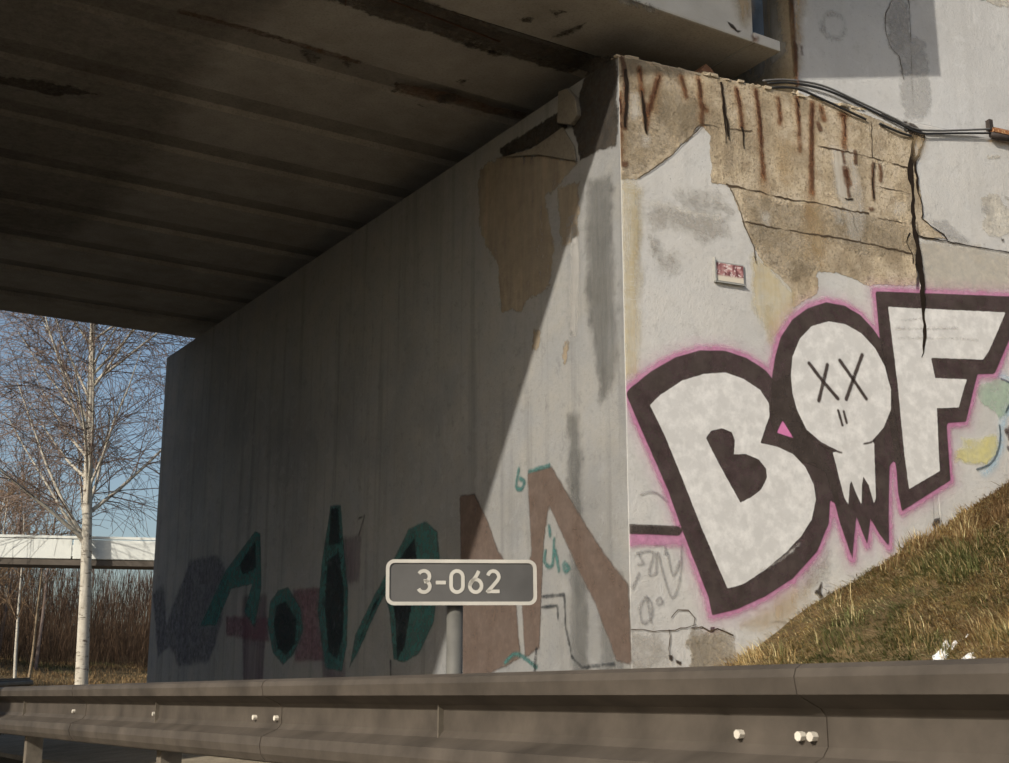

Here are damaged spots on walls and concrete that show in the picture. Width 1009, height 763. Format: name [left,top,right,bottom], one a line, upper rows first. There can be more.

crack [885,0,913,91]
rust [619,56,661,139]
spalling [334,0,1009,313]
rust [680,75,708,123]
rust [720,82,745,149]
rust [755,89,765,179]
rust [795,96,826,194]
rust [839,113,857,200]
rust [869,162,883,211]
crack [726,122,1009,356]